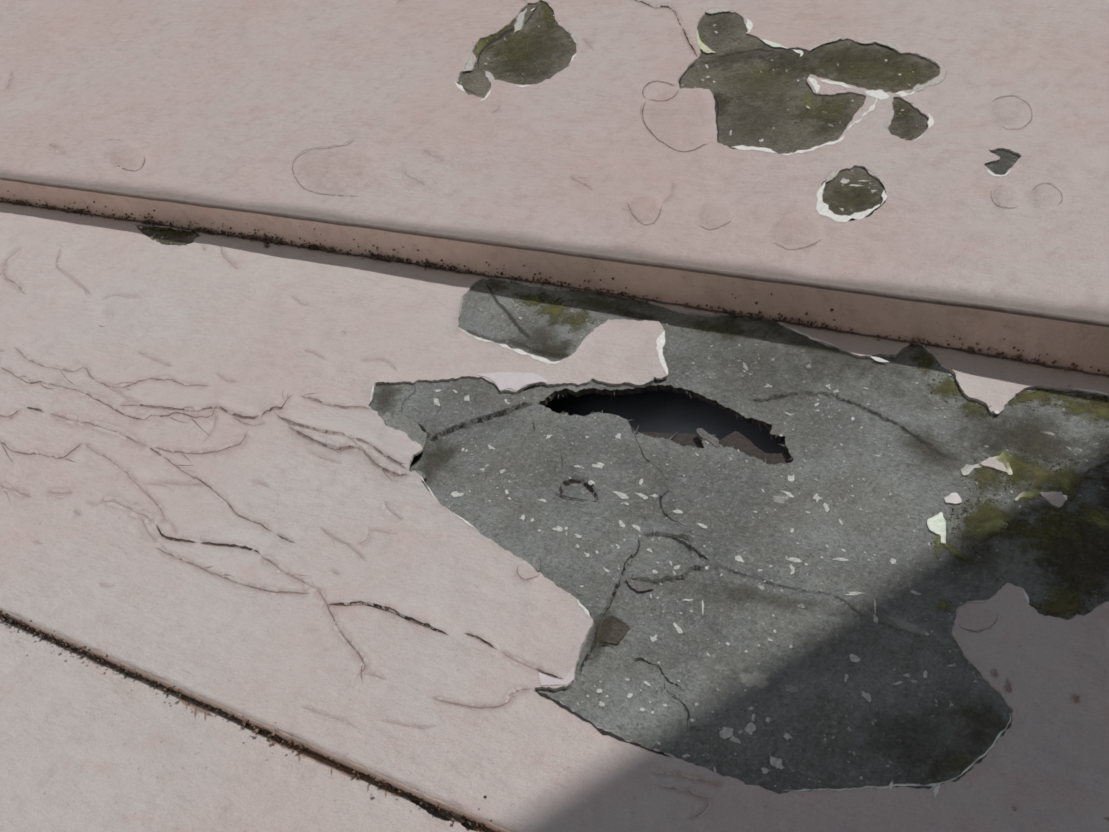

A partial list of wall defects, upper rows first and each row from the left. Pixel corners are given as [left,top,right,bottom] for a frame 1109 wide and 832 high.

peeling [455,1,578,101]
peeling [640,8,946,156]
peeling [816,165,887,223]
peeling [985,150,1020,177]
crack [1,353,405,476]
crack [151,448,295,555]
peeling [369,278,1109,799]
crack [329,601,494,648]